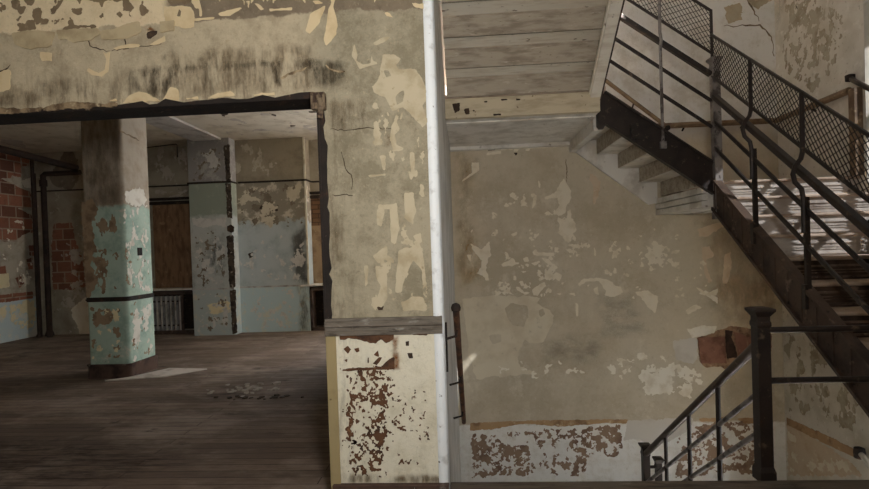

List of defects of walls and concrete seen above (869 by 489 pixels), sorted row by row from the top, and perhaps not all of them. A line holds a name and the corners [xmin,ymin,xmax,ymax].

peeling [0,0,292,77]
peeling [303,0,338,45]
peeling [724,0,771,24]
crack [724,0,774,56]
spalling [0,153,36,330]
spalling [192,144,306,334]
peeling [462,179,684,380]
peeling [694,222,732,304]
spalling [607,325,751,399]
peeling [339,335,430,477]
peeling [784,334,859,473]
peeling [470,417,754,478]